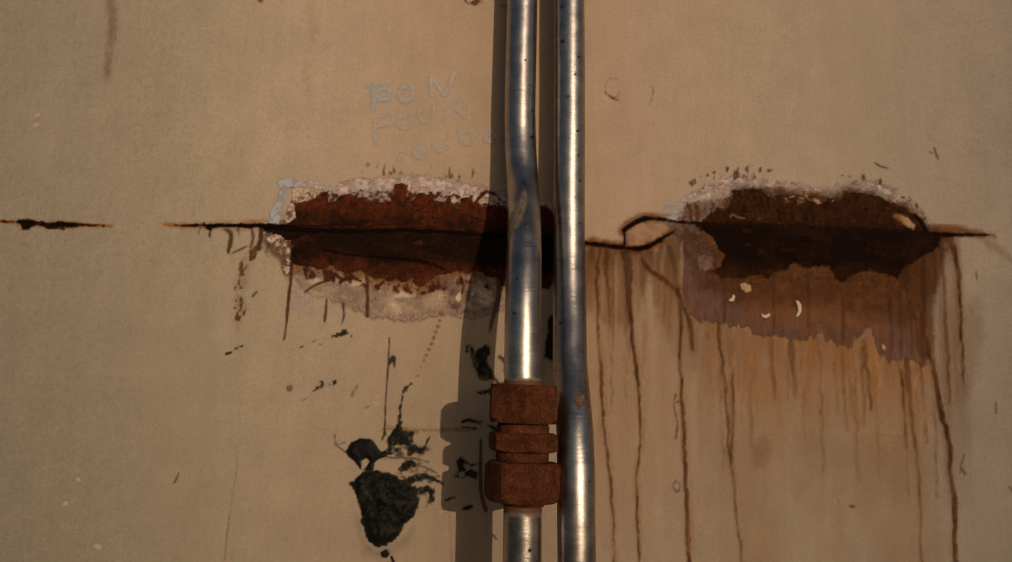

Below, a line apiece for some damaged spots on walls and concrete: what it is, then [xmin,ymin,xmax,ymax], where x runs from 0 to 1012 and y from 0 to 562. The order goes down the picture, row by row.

crack [0,219,112,230]
crack [164,222,507,321]
rust [268,170,508,356]
rust [540,201,553,289]
crack [585,213,989,253]
rust [585,167,964,562]